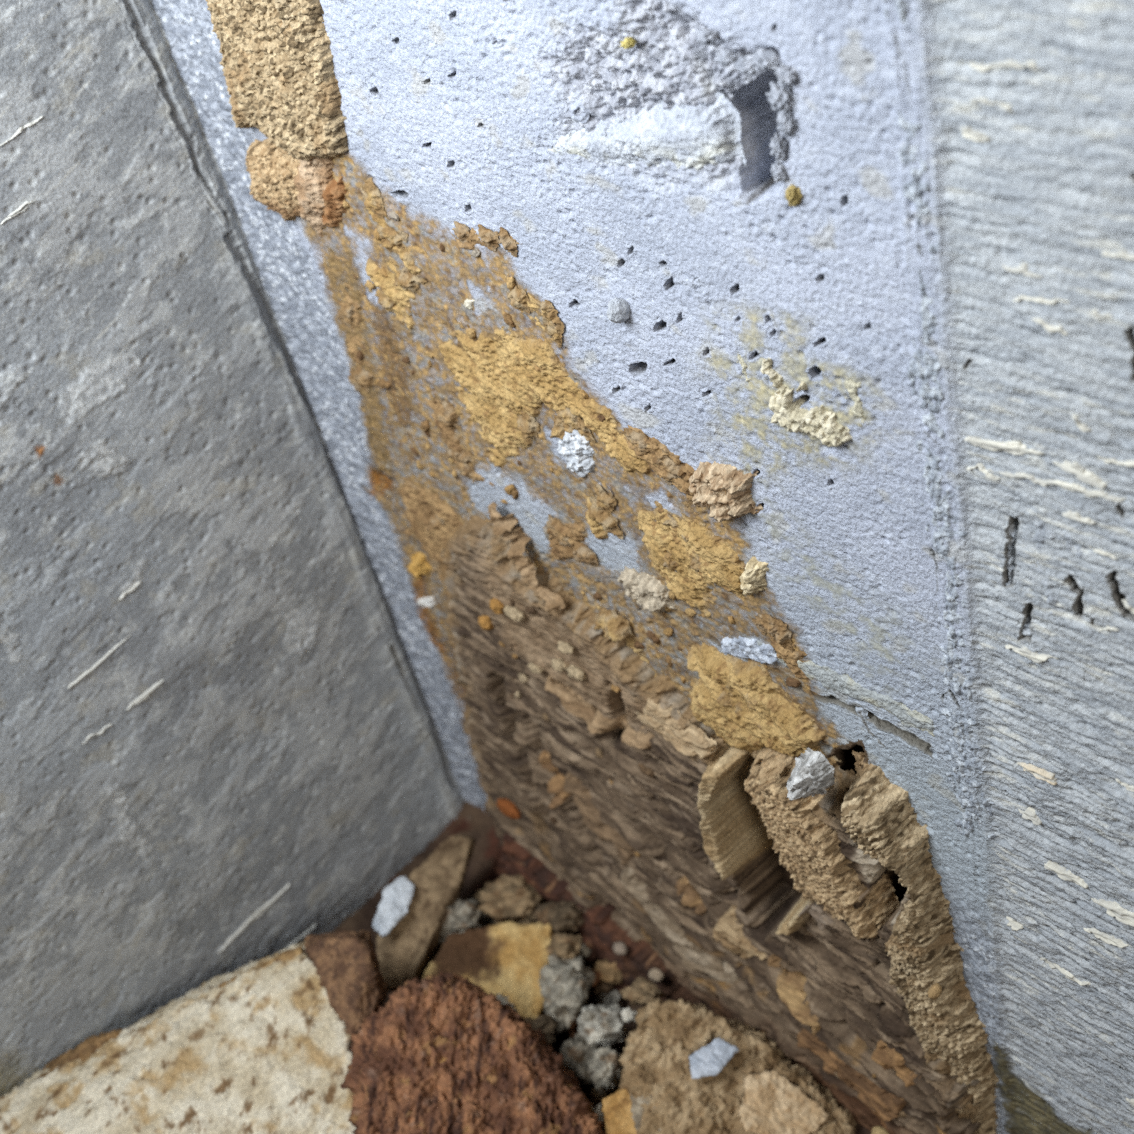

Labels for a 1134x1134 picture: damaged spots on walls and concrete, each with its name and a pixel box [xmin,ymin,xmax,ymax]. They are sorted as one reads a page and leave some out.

peeling [360,177,408,252]
peeling [452,221,517,257]
peeling [378,267,427,311]
peeling [507,285,564,347]
spalling [516,407,624,540]
peeling [621,427,685,485]
peeling [545,514,598,566]
spalling [417,597,437,609]
peeling [594,607,633,642]
spalling [720,613,795,664]
crack [674,609,936,760]
spalling [786,739,869,800]